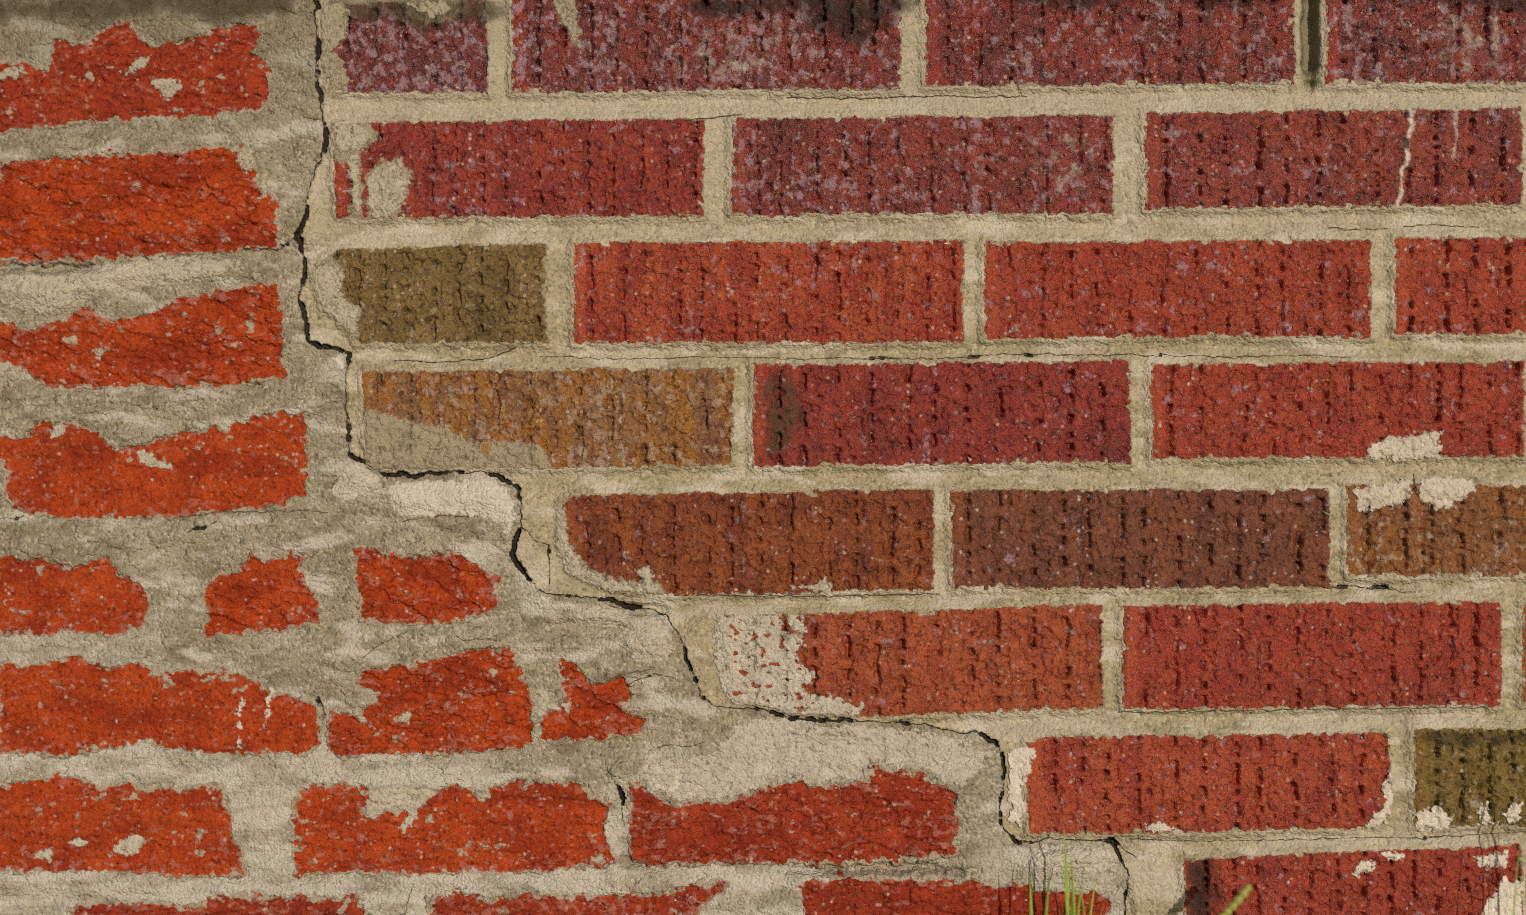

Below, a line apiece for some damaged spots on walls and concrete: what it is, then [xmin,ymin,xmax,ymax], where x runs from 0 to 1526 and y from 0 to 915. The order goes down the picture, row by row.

crack [1328,223,1480,231]
crack [395,347,1351,363]
crack [244,0,1135,915]
crack [1413,474,1435,512]
crack [179,477,339,533]
crack [1306,584,1416,593]
spalling [633,612,984,806]
crack [1118,706,1494,714]
crack [1131,831,1526,842]